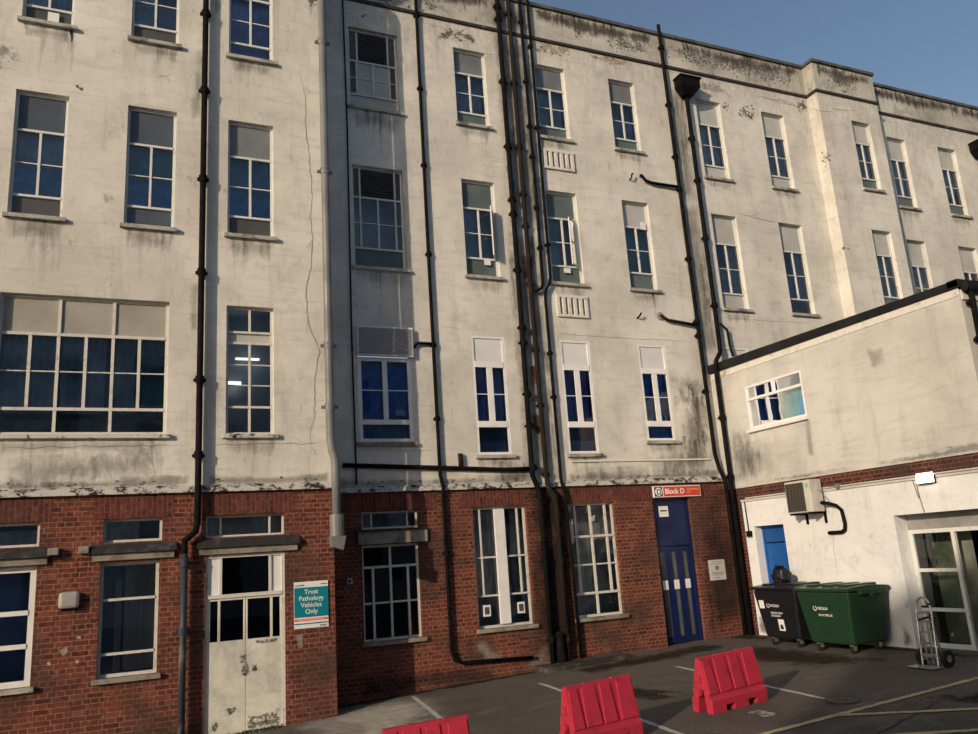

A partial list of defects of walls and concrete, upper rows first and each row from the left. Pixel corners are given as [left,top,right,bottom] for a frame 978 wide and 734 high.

flaking render [438,28,475,43]
water stain [538,11,649,42]
water stain [682,42,794,74]
crack [10,71,320,482]